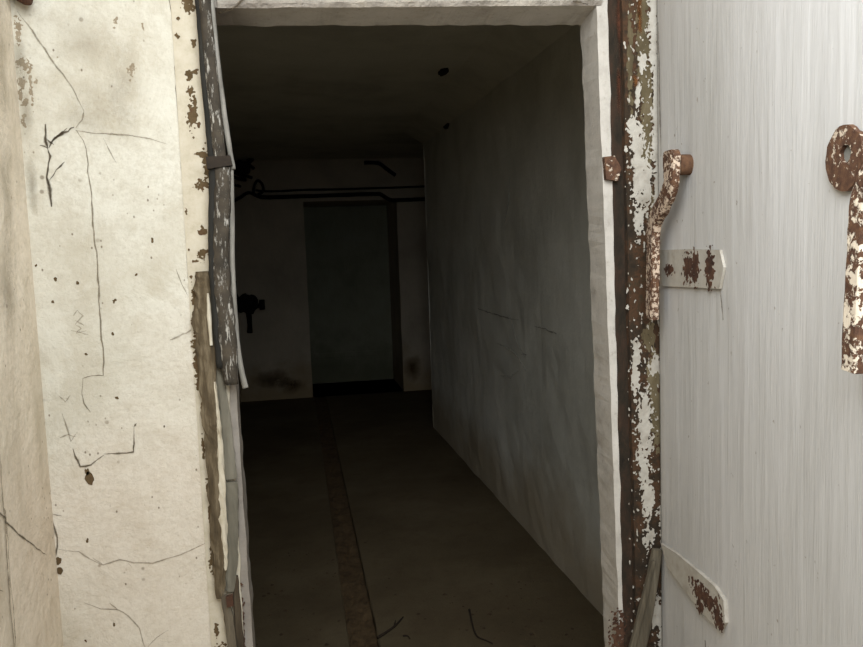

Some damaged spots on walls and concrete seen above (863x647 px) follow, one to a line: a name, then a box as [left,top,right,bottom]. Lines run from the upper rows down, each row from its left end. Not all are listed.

peeling [176,0,196,21]
peeling [185,69,201,139]
peeling [194,142,209,192]
crack [19,14,137,467]
corrosion [664,245,716,292]
peeling [189,275,199,391]
peeling [623,0,661,632]
crack [0,462,133,646]
peeling [652,593,662,647]
corrosion [688,576,724,633]